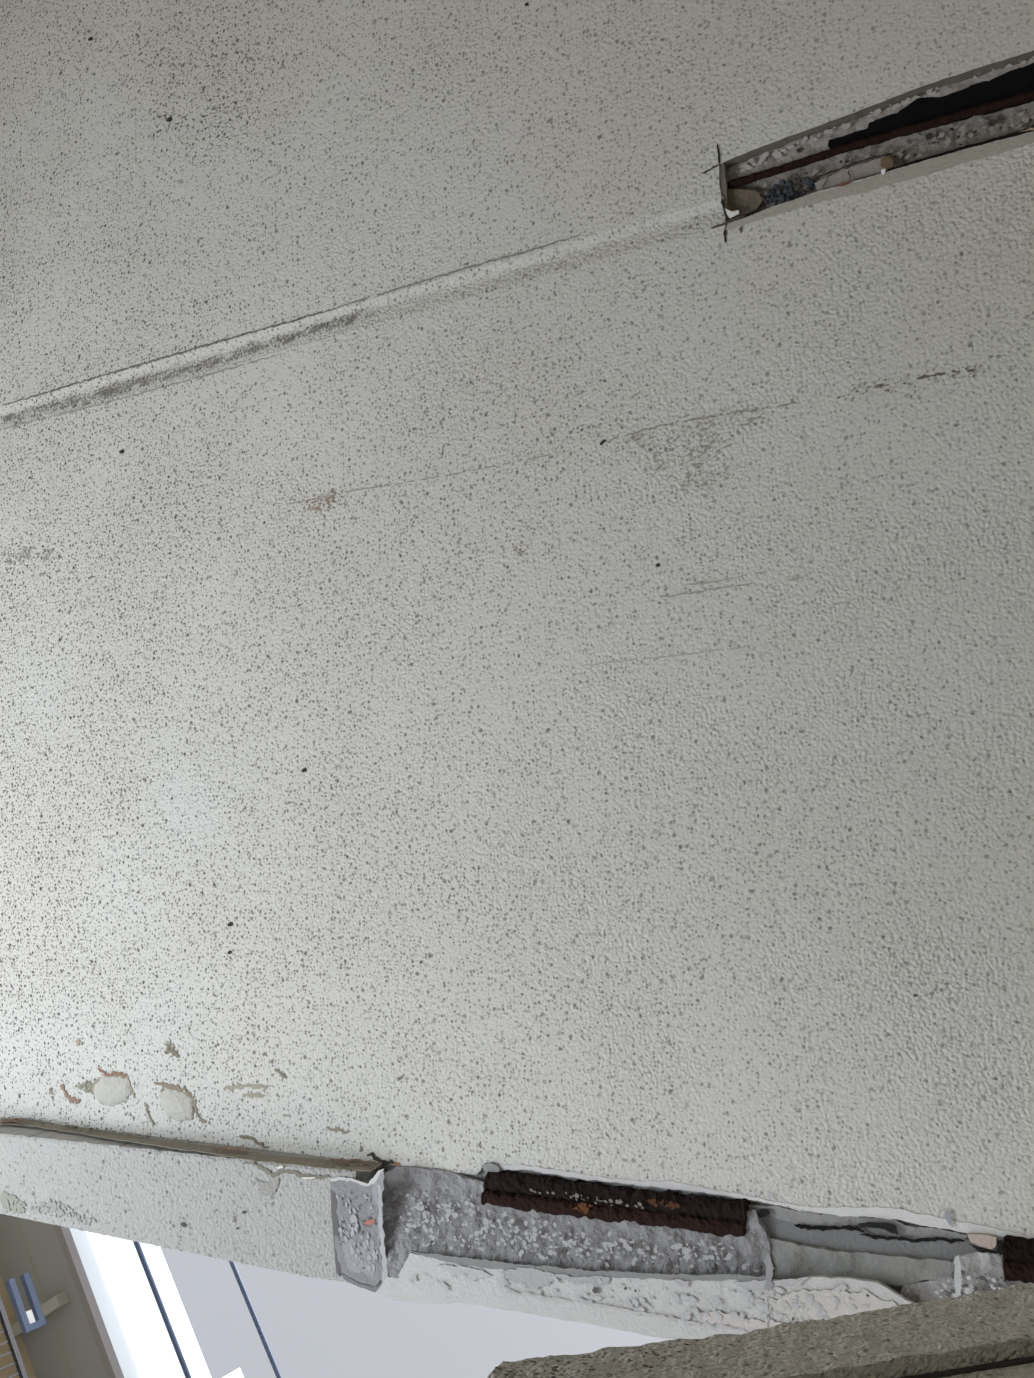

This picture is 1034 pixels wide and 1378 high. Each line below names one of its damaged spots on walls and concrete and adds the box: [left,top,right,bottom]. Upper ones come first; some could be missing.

spalling [719,51,1034,234]
crack [2,234,581,429]
crack [59,1068,287,1127]
crack [239,1135,330,1180]
crack [326,1126,394,1166]
spalling [301,1162,1034,1340]